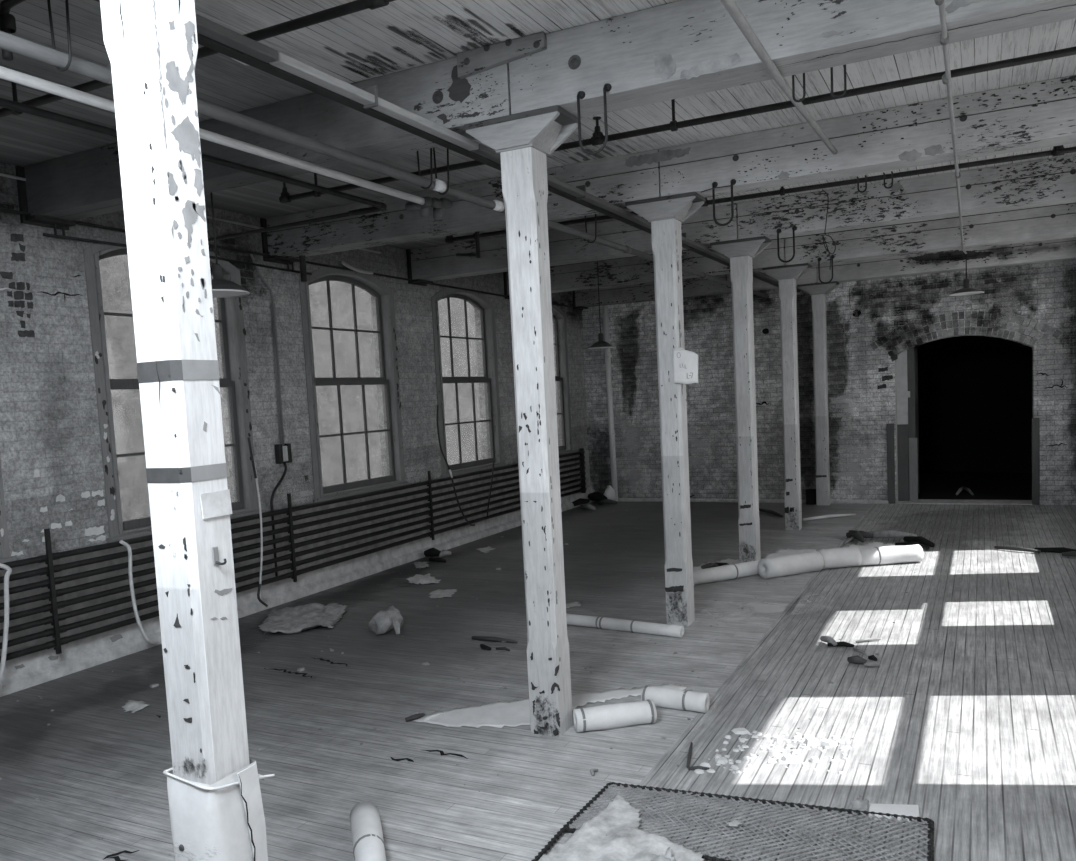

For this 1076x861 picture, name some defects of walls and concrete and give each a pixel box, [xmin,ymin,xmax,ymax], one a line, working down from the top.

water stain [325,8,525,78]
peeling [937,79,1076,150]
peeling [143,0,213,317]
flaking render [0,233,35,337]
water stain [851,267,1036,350]
peeling [900,244,1028,271]
water stain [618,310,639,414]
water stain [1061,268,1076,435]
peeling [81,388,115,542]
peeling [40,494,73,542]
peeling [665,585,687,624]
peeling [531,657,561,736]